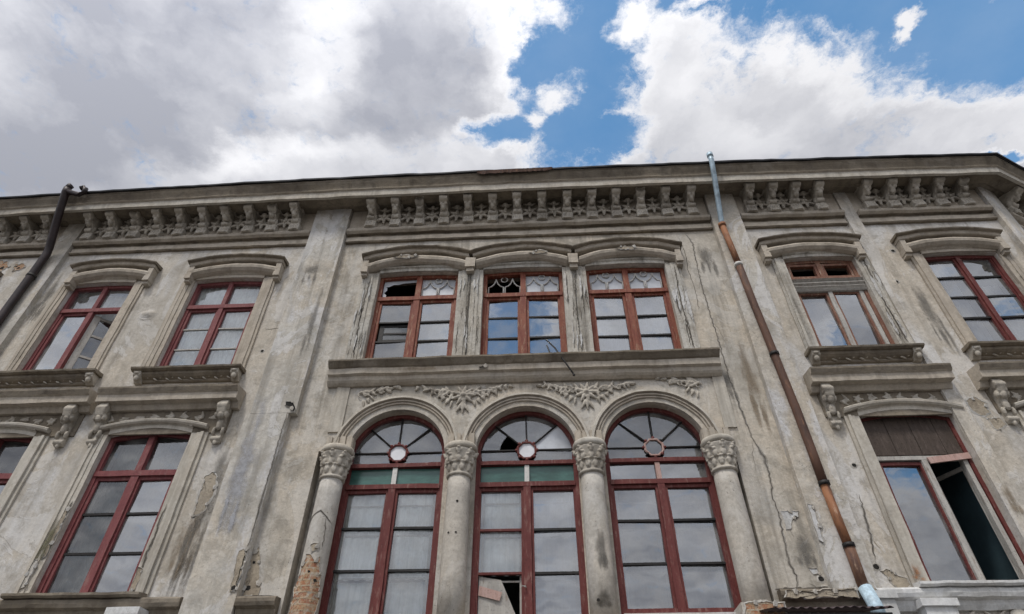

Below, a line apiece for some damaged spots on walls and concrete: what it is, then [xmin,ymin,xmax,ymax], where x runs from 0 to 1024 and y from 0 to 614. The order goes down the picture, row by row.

crack [682,235,828,590]
spalling [191,471,218,519]
spalling [779,503,824,543]
crack [859,496,877,562]
spalling [230,546,262,596]
flaking render [288,542,322,614]